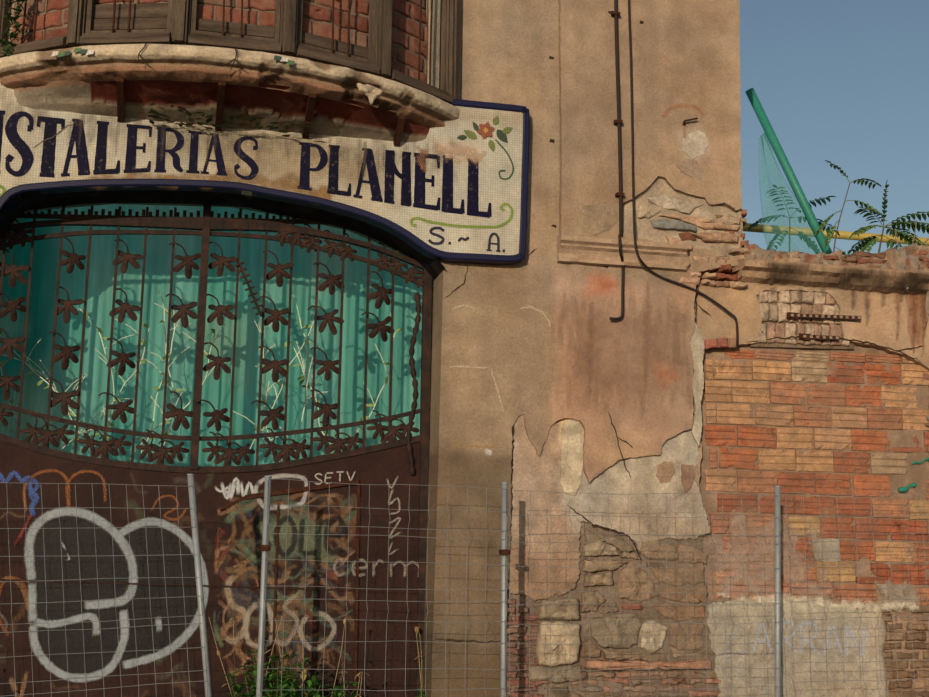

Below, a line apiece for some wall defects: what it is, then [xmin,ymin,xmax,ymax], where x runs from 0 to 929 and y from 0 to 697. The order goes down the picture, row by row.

spalling [623,176,741,258]
water stain [770,264,793,283]
water stain [829,269,868,305]
water stain [880,273,929,293]
crack [609,414,633,478]
spalling [507,401,721,697]